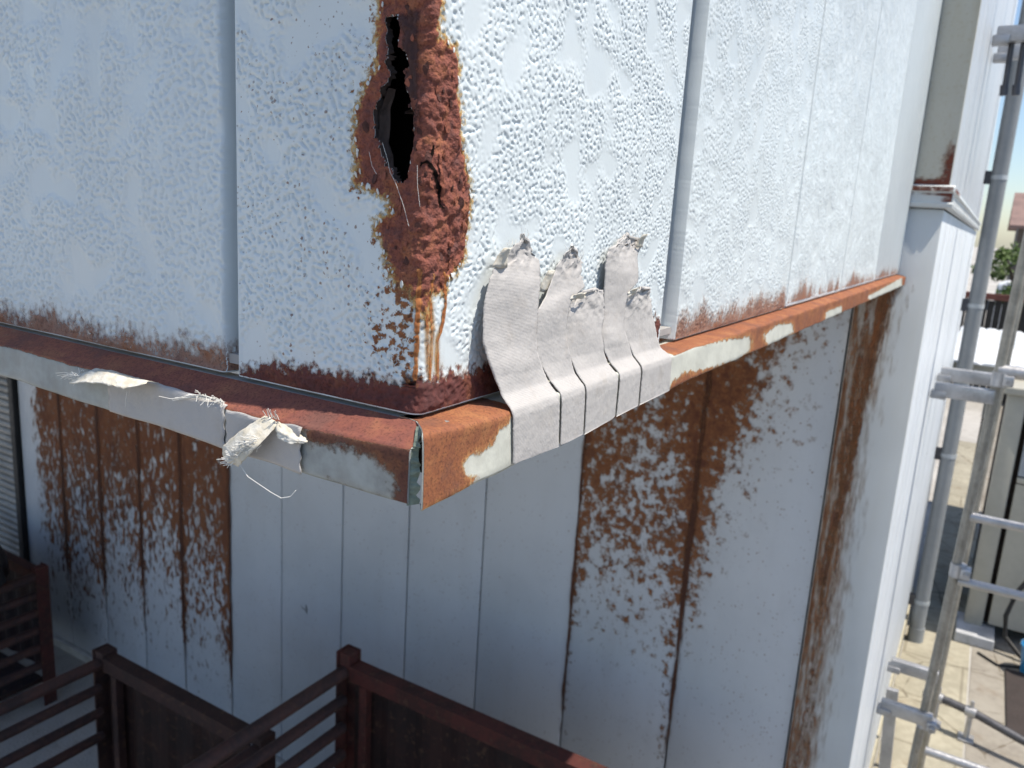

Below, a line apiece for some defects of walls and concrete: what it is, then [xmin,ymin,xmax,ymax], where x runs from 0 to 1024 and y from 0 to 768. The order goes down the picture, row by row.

peeling [69,368,159,389]
corrosion [30,387,232,684]
corrosion [0,0,512,510]
peeling [222,416,308,467]
corrosion [562,268,906,768]